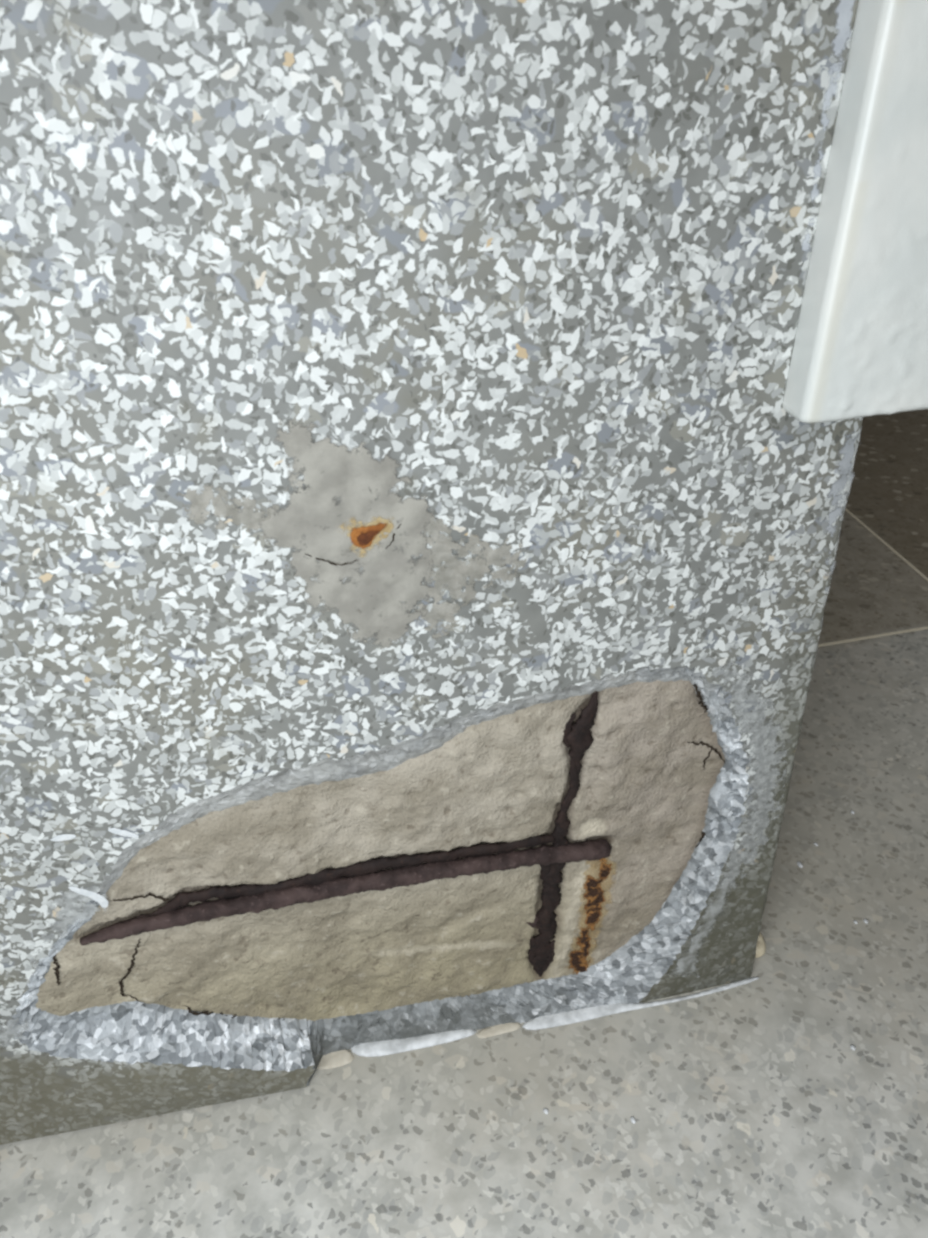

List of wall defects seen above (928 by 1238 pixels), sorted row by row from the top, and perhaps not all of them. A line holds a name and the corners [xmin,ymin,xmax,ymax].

rust [341,517,393,557]
crack [687,684,725,769]
spalling [7,665,749,1087]
rust [569,858,612,975]
crack [119,939,145,1006]